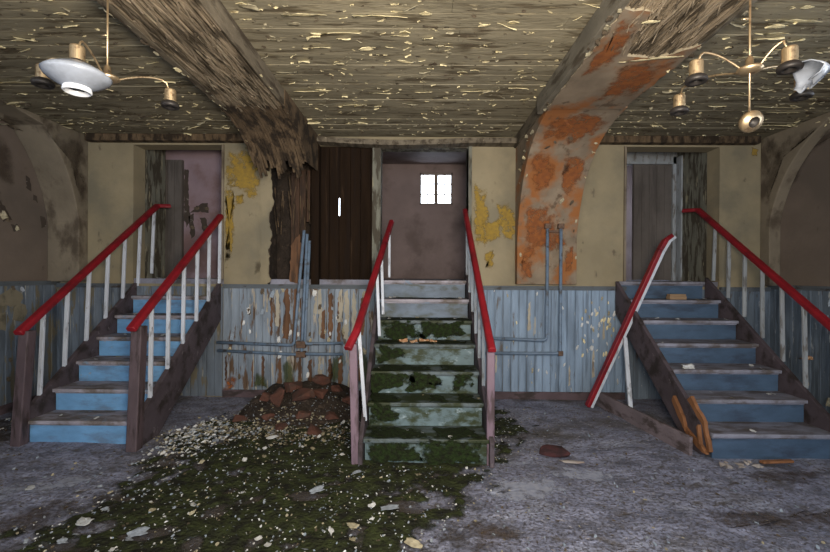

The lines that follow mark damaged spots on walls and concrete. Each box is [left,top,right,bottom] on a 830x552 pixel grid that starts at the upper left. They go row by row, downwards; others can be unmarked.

peeling [0,0,239,136]
peeling [230,0,546,135]
corrosion [583,20,635,75]
corrosion [599,62,674,100]
spalling [519,2,830,205]
spalling [242,160,367,389]
spalling [520,207,577,278]